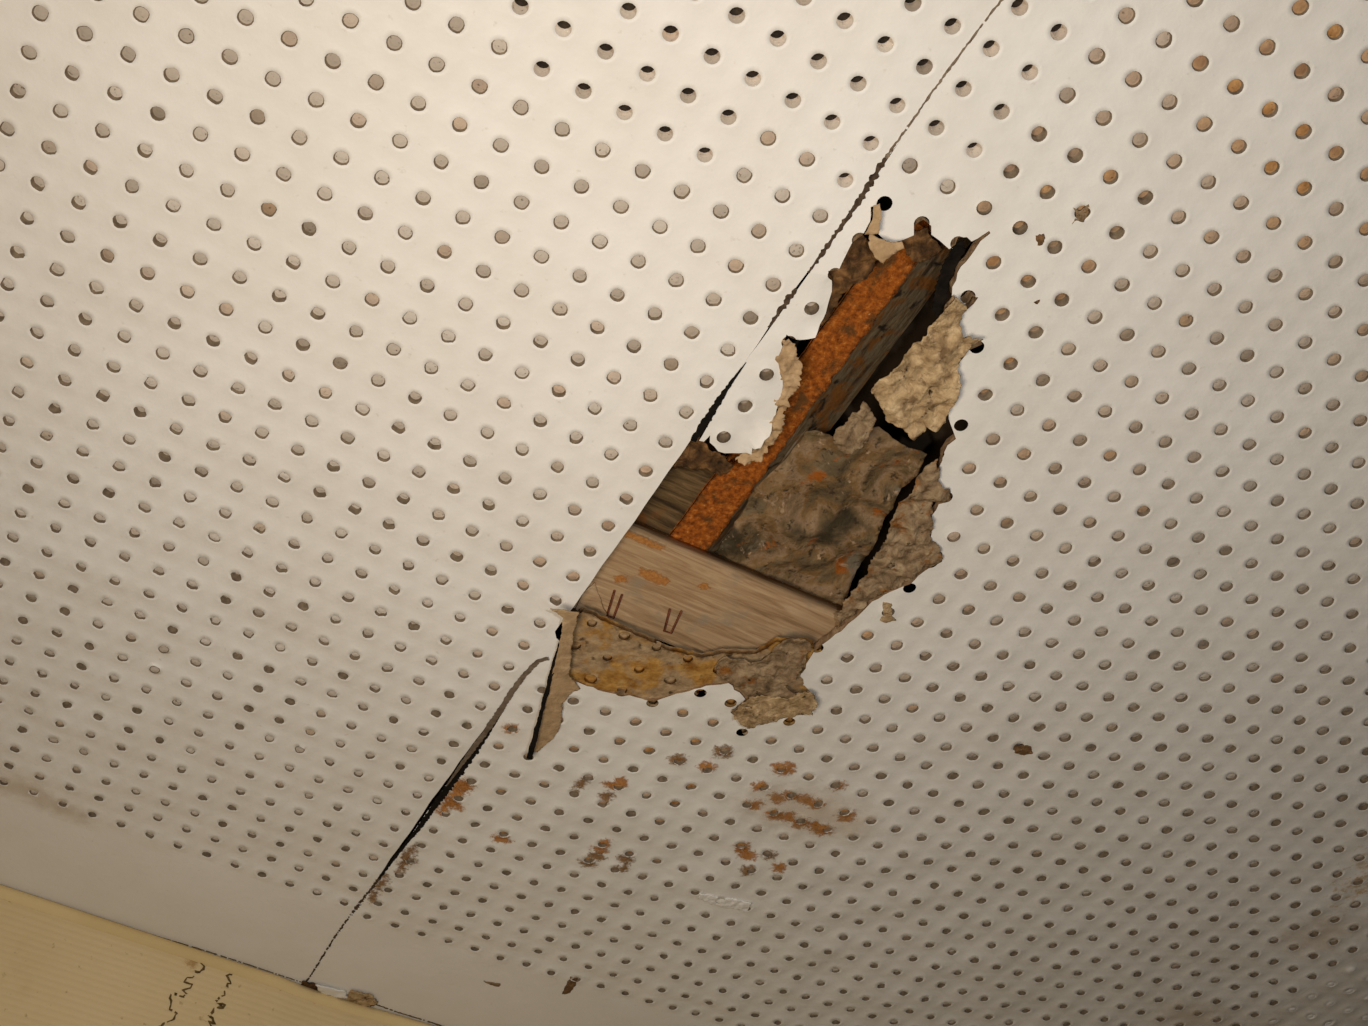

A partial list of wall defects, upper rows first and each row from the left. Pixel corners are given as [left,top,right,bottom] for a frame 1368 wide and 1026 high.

crack [768,0,1003,328]
crack [691,362,746,442]
spalling [526,204,990,760]
corrosion [669,744,733,773]
corrosion [435,779,474,816]
corrosion [573,776,627,803]
corrosion [746,761,857,837]
crack [152,657,549,1026]
corrosion [369,845,418,903]
corrosion [579,839,632,872]
corrosion [734,842,787,876]